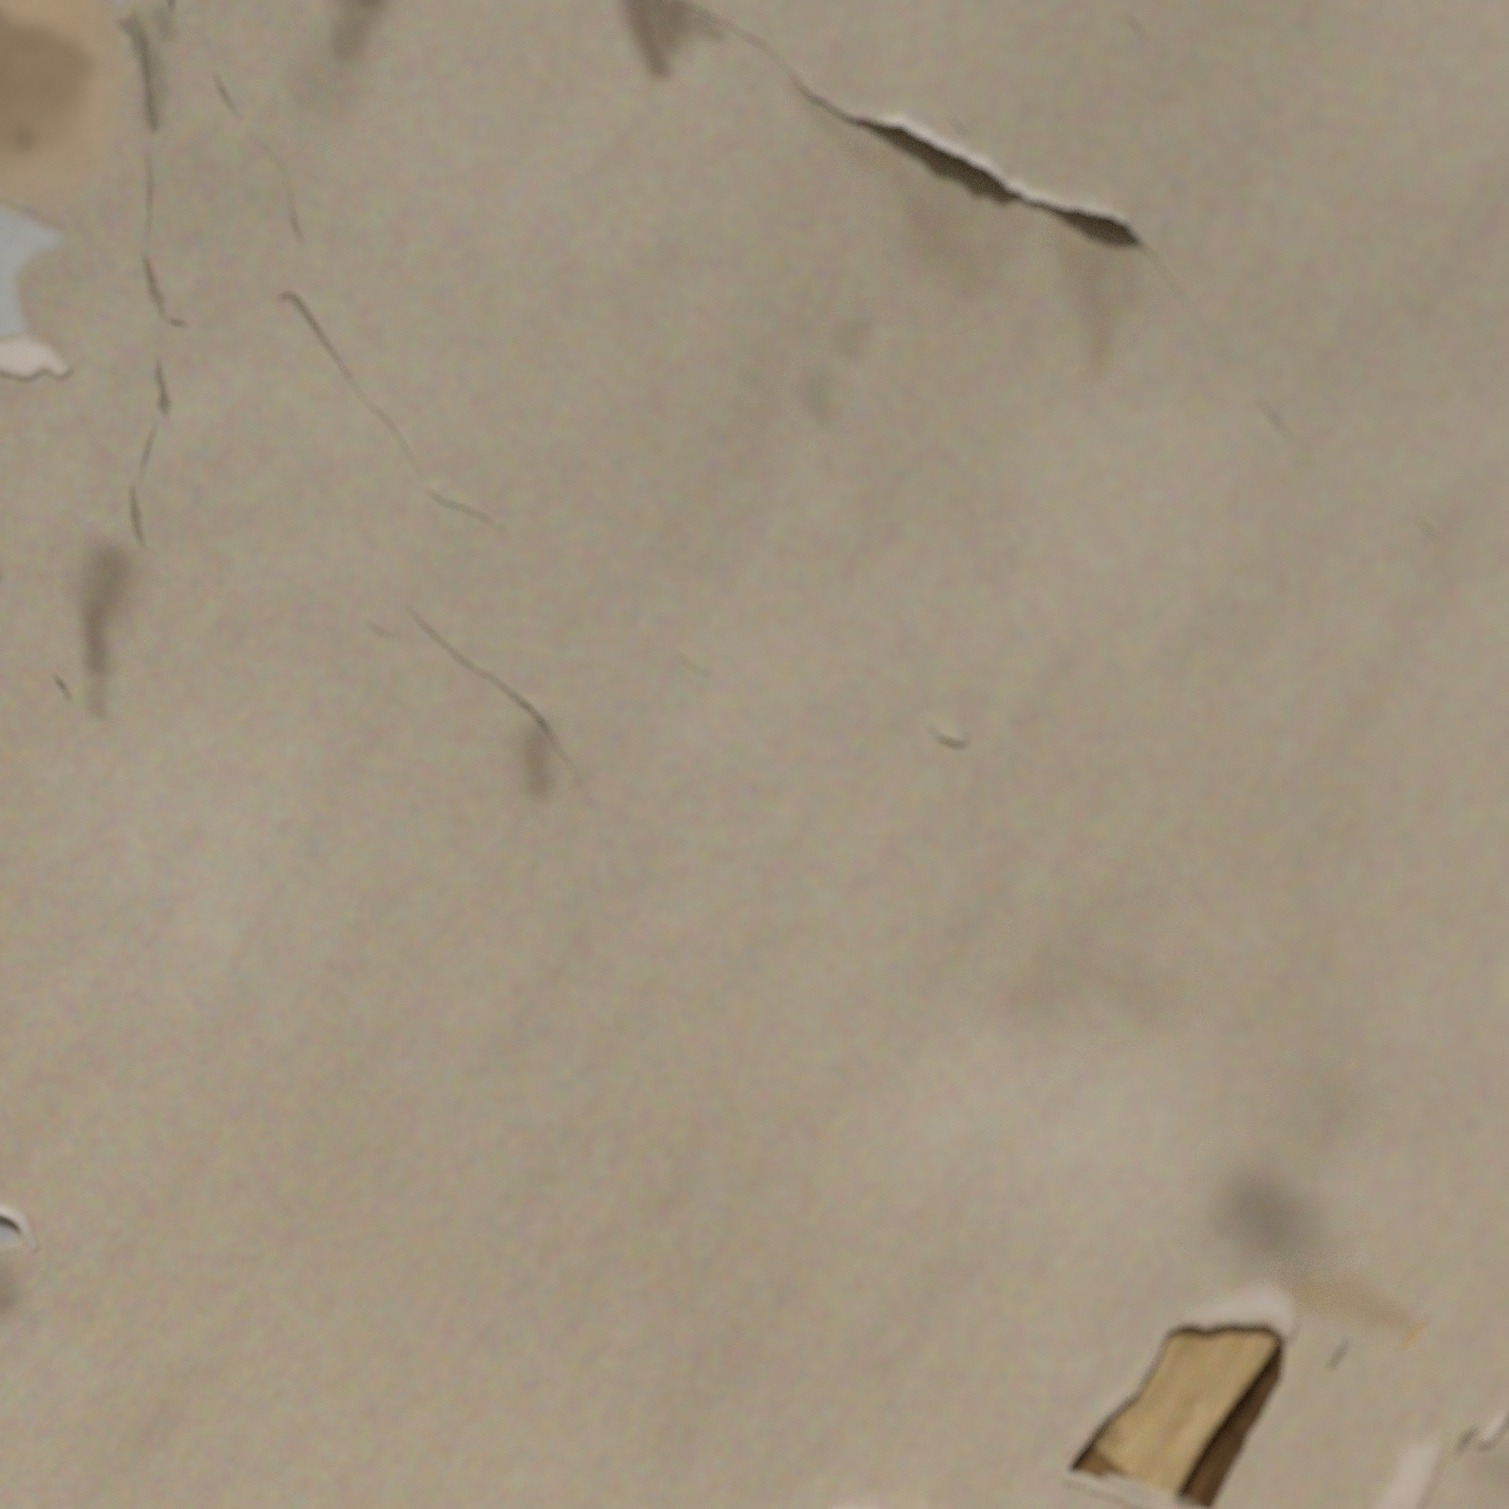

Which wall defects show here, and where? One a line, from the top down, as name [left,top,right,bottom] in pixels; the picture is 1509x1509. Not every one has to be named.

peeling [0,0,138,381]
crack [130,27,189,552]
crack [214,69,304,246]
crack [279,286,504,530]
crack [363,606,595,804]
spalling [1058,1281,1299,1509]
peeling [1366,1428,1448,1509]
peeling [1478,1405,1509,1446]